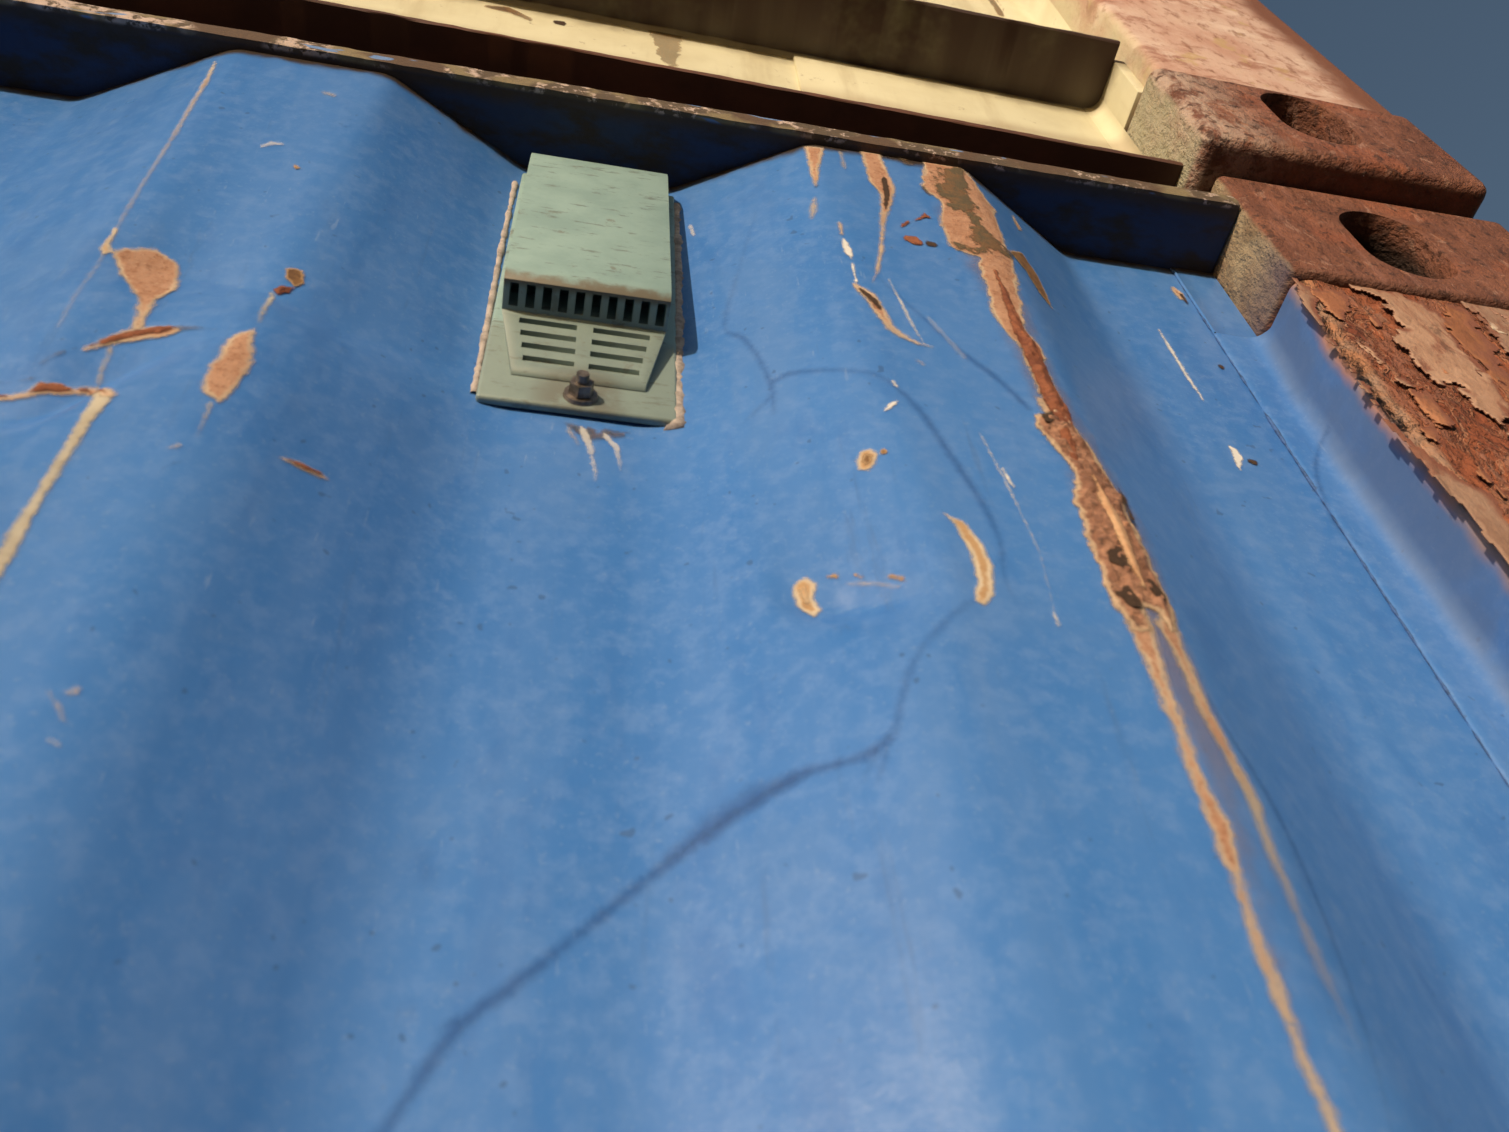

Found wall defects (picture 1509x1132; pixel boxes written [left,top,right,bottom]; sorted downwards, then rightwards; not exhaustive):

spalling [839,222,857,282]
peeling [1292,278,1509,565]
spalling [284,458,325,478]
spalling [947,515,994,604]
corrosion [921,162,1340,1132]